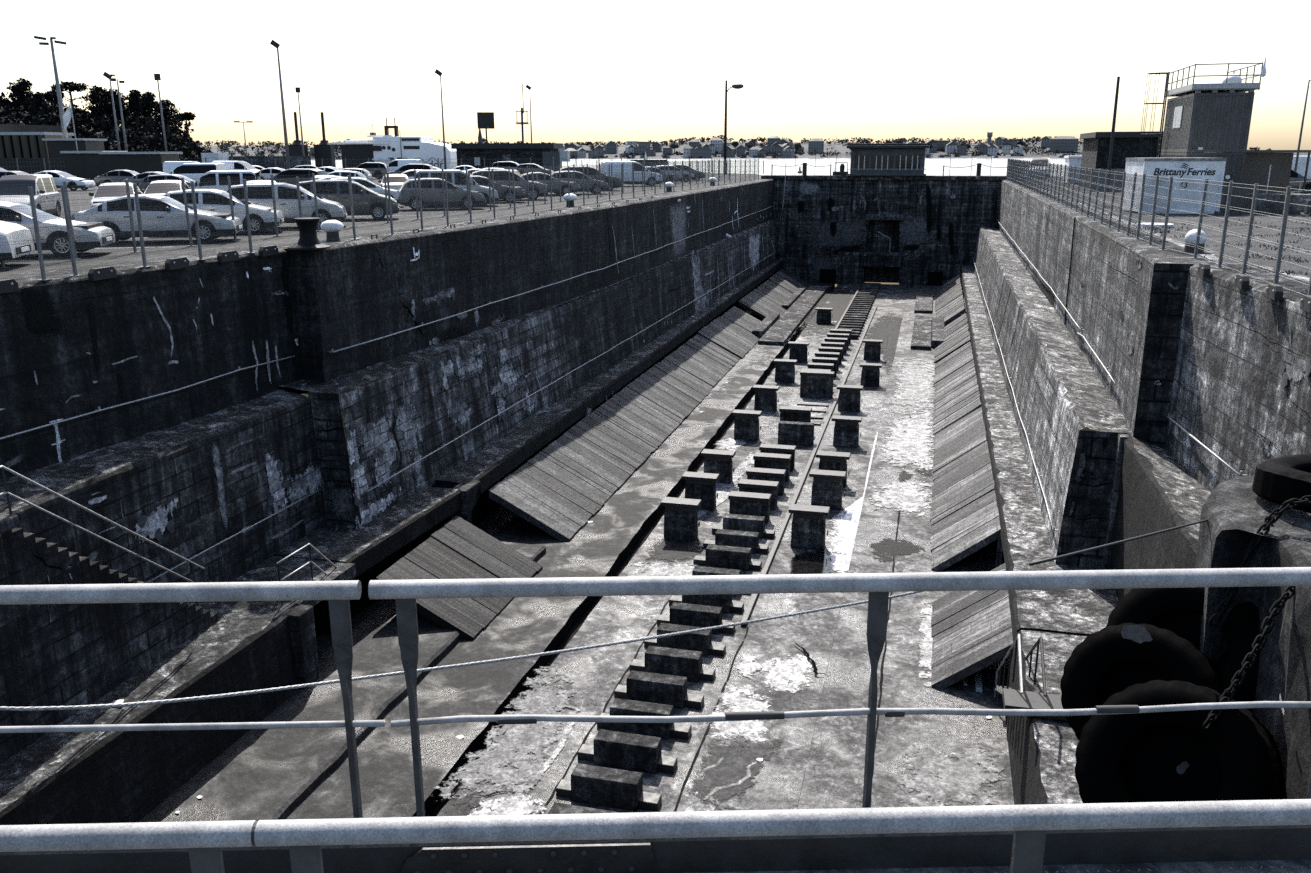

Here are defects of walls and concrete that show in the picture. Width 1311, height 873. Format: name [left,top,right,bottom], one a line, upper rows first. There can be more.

spalling [1278,349,1311,388]